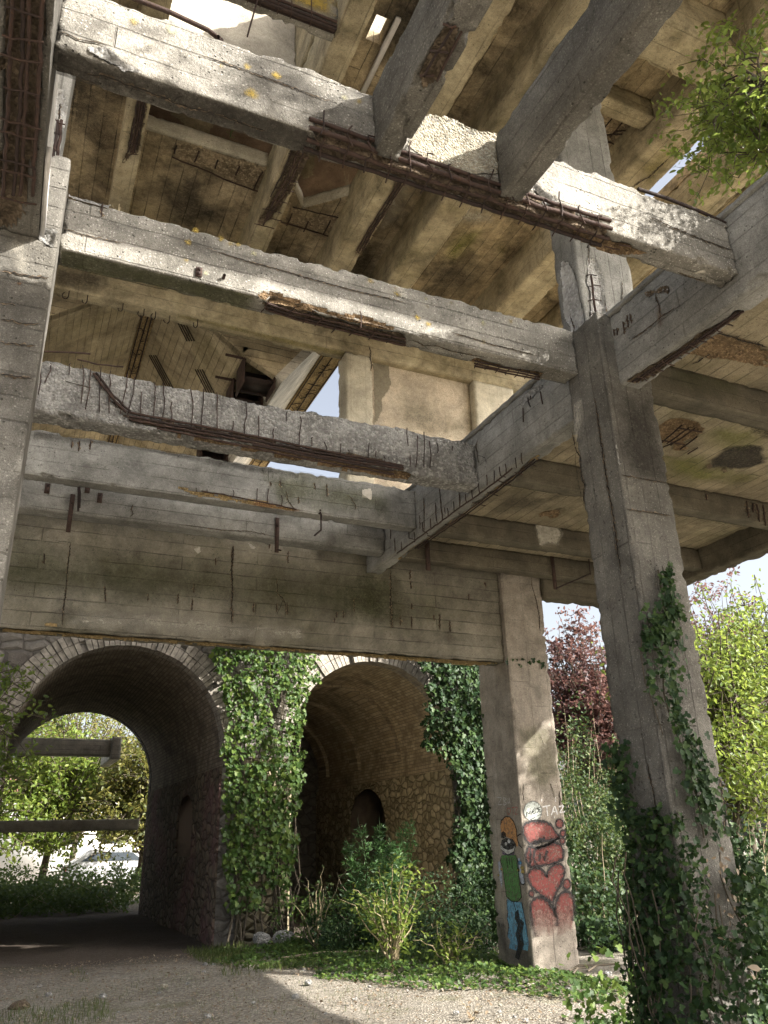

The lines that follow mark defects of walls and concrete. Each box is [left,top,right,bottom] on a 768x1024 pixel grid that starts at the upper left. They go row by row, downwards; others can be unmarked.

spalling [419,23,463,88]
spalling [254,110,647,332]
spalling [258,291,406,347]
spalling [627,310,768,384]
spalling [38,317,439,480]
spalling [659,418,704,454]
damp [712,426,768,469]
spalling [178,487,297,511]